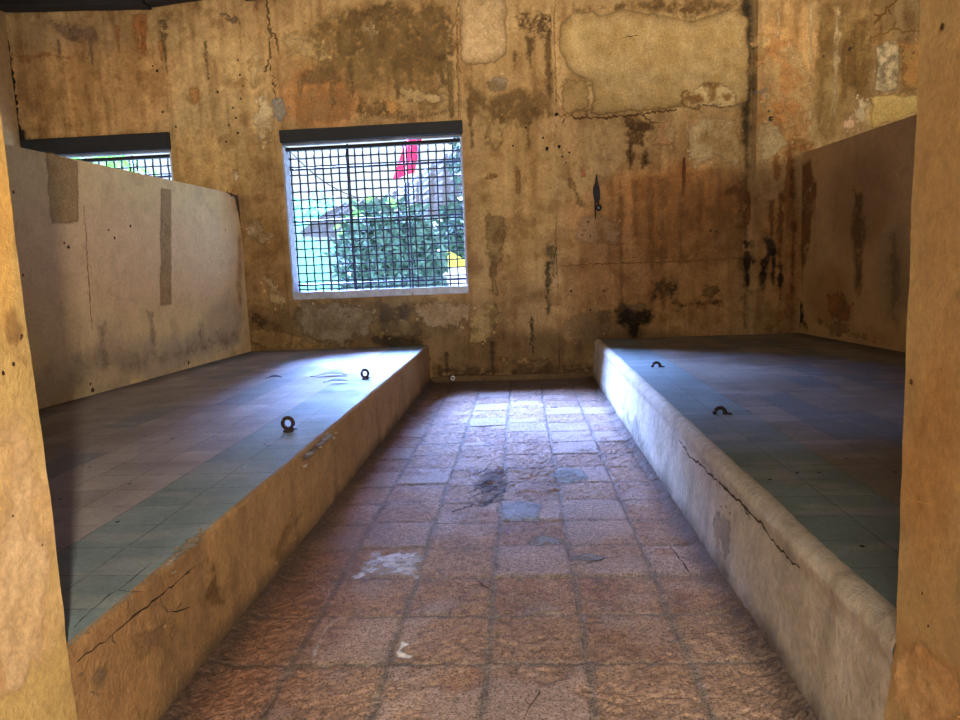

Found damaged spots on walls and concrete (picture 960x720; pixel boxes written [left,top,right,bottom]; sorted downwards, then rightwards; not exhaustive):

crack [263,0,279,104]
peeling [254,95,289,149]
leakage [297,2,454,120]
crack [553,0,677,148]
leakage [639,0,755,149]
spalling [843,38,919,132]
leakage [545,246,556,314]
leakage [614,305,654,338]
leakage [744,236,784,299]
crack [679,440,800,568]
crack [74,565,195,663]